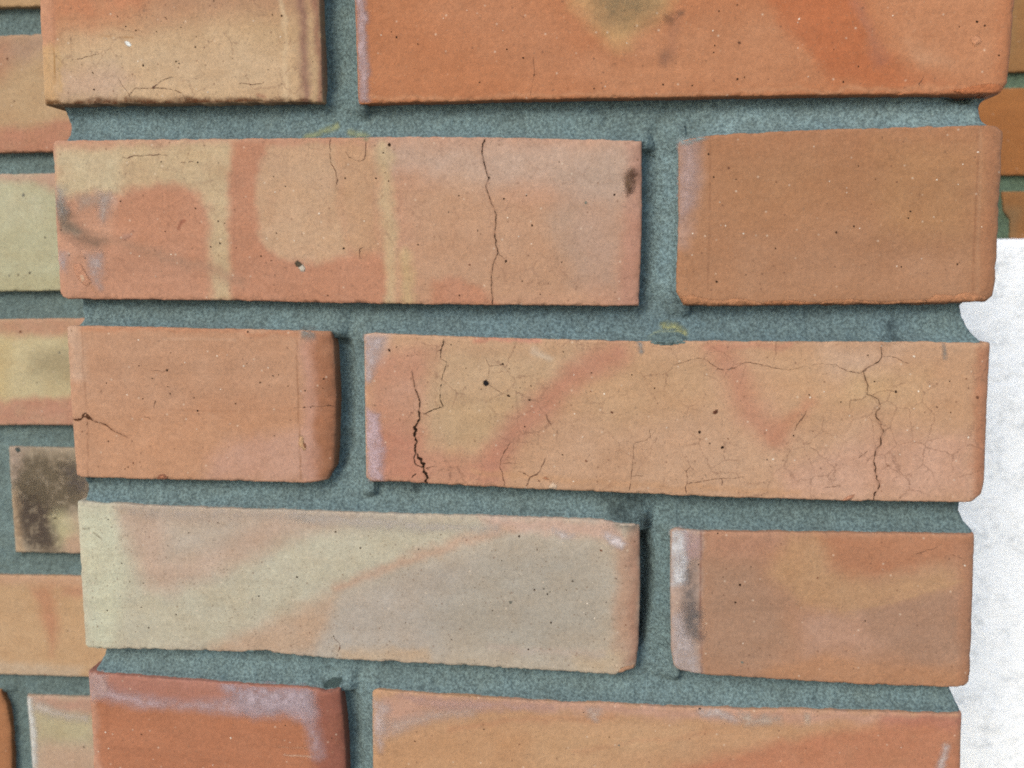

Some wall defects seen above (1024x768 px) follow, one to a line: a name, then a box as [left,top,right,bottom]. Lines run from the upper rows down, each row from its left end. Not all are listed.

crack [481,138,504,305]
crack [73,413,126,437]
crack [411,343,447,483]
crack [500,441,545,486]
crack [678,346,906,500]
efflorescence [671,532,698,585]